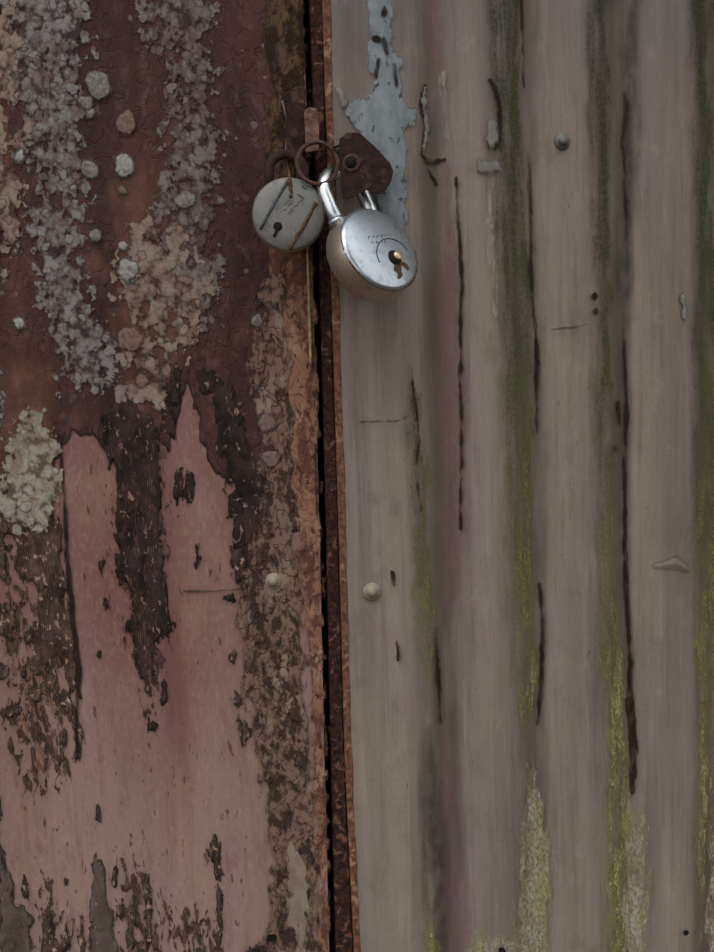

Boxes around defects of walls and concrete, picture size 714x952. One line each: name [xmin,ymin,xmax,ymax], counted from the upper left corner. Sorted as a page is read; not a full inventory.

peeling [336,0,417,232]
crack [419,84,464,530]
peeling [0,515,85,798]
corrosion [0,0,330,952]
peeling [96,270,323,952]
crack [360,381,422,512]
crack [388,570,396,586]
crack [393,641,401,662]
crack [434,627,442,724]
crack [614,340,638,794]
peeling [0,834,224,952]